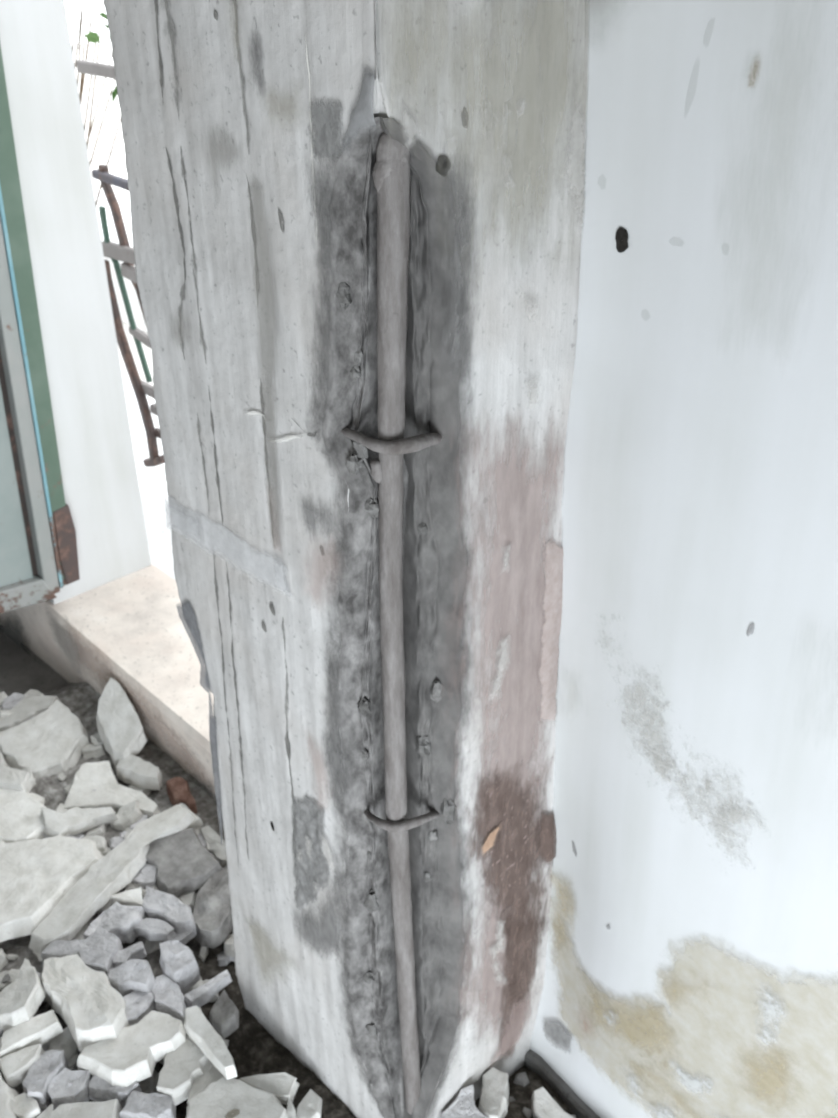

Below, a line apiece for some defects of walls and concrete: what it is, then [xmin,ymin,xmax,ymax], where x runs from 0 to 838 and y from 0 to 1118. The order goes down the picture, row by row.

damp [313,174,329,293]
spalling [292,102,473,1118]
rust [471,435,559,1058]
damp [295,873,340,956]
damp [554,883,838,1118]